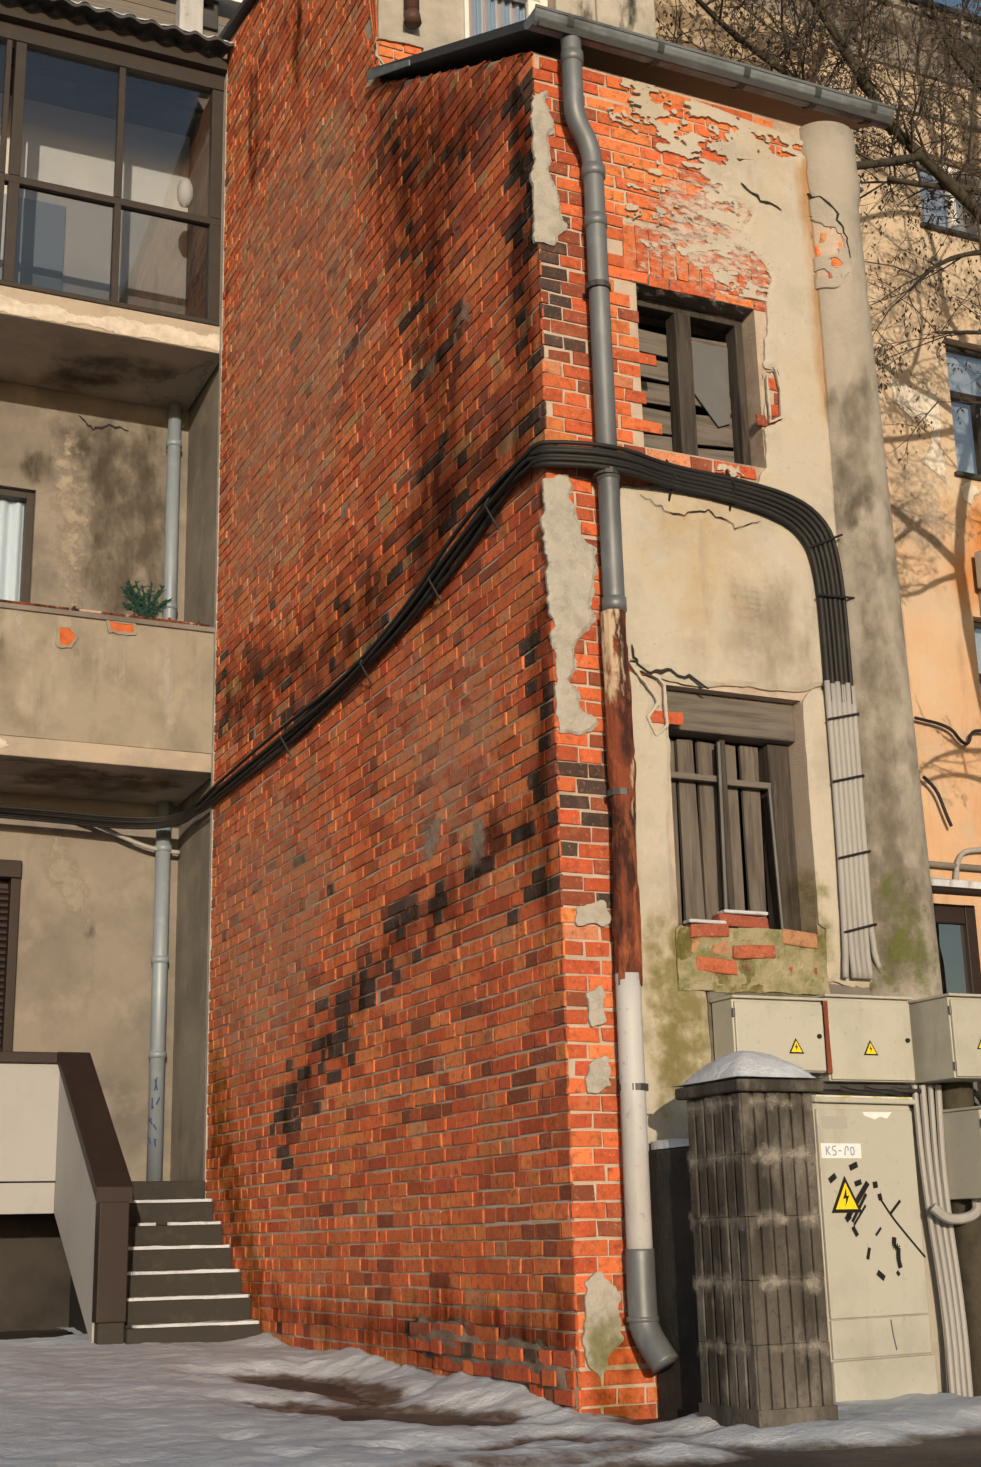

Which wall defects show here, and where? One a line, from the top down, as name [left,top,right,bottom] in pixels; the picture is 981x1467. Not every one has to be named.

flaking render [531,57,564,114]
flaking render [537,140,596,447]
flaking render [582,68,804,481]
flaking render [564,467,594,479]